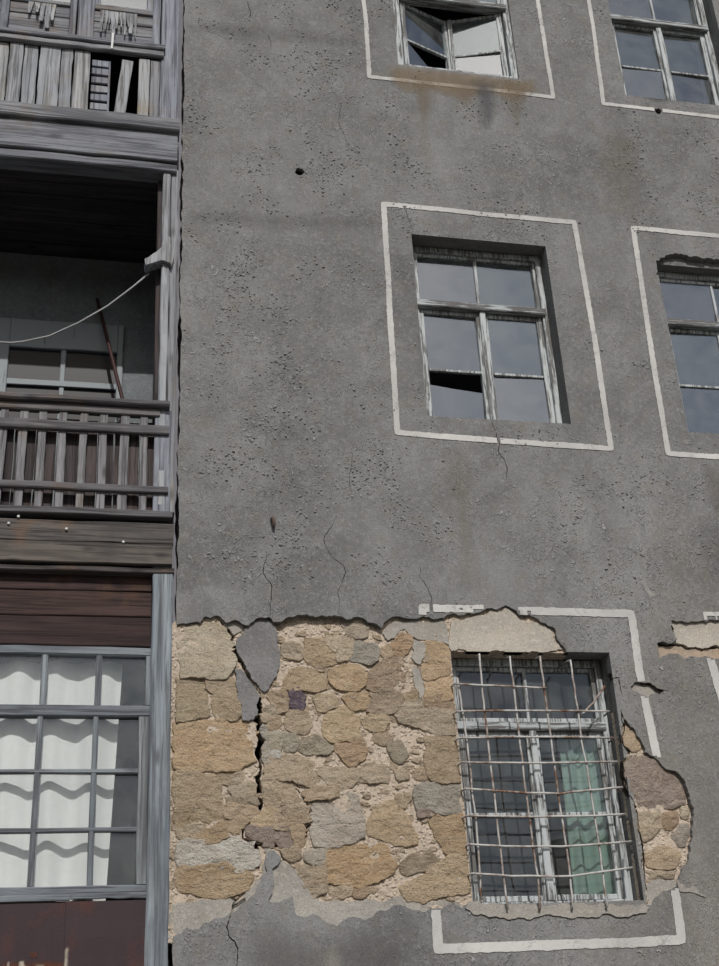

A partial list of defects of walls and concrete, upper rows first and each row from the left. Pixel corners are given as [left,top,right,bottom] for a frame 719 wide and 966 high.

spalling [657,257,719,289]
spalling [658,621,719,659]
crack [253,701,264,811]
spalling [168,607,568,949]
spalling [611,712,691,905]